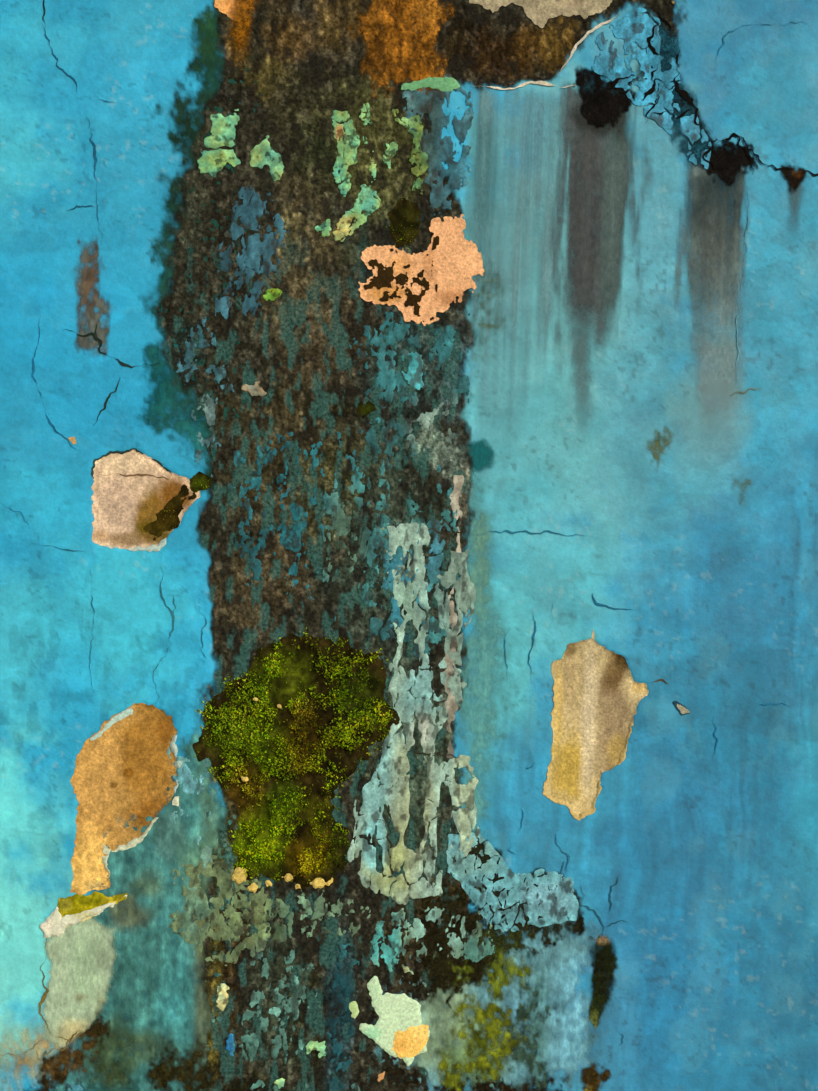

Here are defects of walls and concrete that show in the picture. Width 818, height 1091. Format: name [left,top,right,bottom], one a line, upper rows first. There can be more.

crack [42,0,129,236]
corrosion [231,0,253,48]
corrosion [348,0,454,96]
crack [609,5,818,396]
damp [76,241,110,355]
crack [32,322,157,449]
peeling [91,448,200,552]
peeling [169,76,582,1091]
damp [147,0,758,1091]
peeling [39,703,208,938]
peeling [543,629,649,821]
damp [36,918,139,1091]